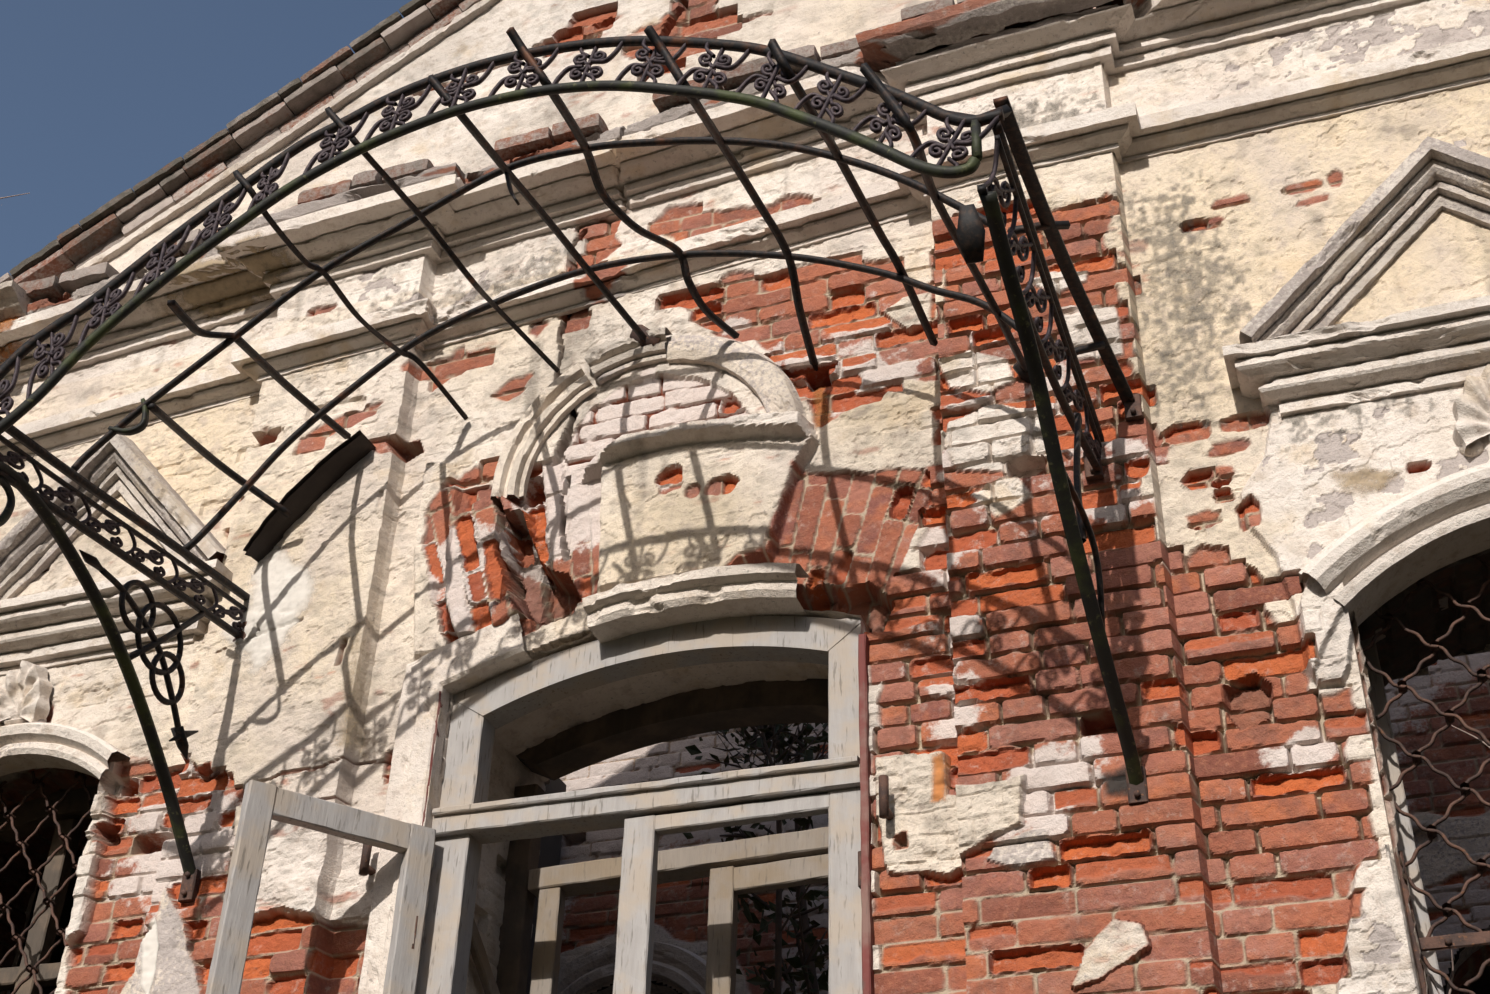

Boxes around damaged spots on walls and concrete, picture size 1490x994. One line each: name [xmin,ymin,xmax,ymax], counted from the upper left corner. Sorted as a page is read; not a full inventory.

crack [644,0,691,82]
peeling [1225,46,1241,72]
peeling [1269,0,1490,66]
spalling [231,0,1147,236]
spalling [0,267,149,322]
spalling [175,247,219,262]
spalling [400,346,496,392]
peeling [1305,428,1490,493]
spalling [421,364,749,643]
spalling [649,179,1405,994]
spalling [61,753,245,994]
spalling [240,820,380,994]